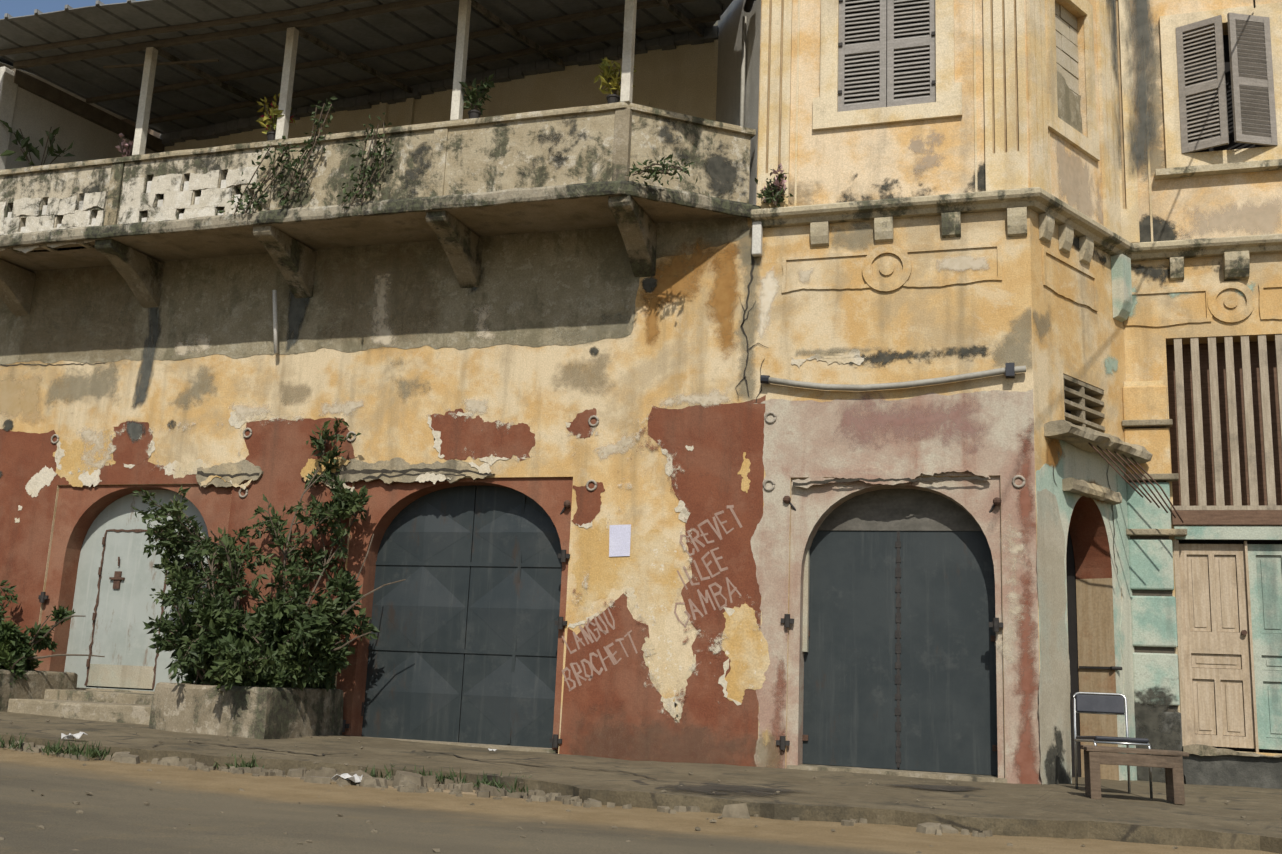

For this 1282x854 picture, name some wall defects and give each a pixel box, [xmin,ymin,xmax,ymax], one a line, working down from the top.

water stain [1106,0,1164,175]
water stain [401,144,432,196]
water stain [520,117,587,175]
water stain [658,118,746,198]
water stain [1139,200,1279,242]
crack [735,247,768,403]
peeling [15,427,135,523]
peeling [139,428,252,490]
flaking render [469,454,525,474]
peeling [568,417,770,722]
water stain [999,525,1024,661]